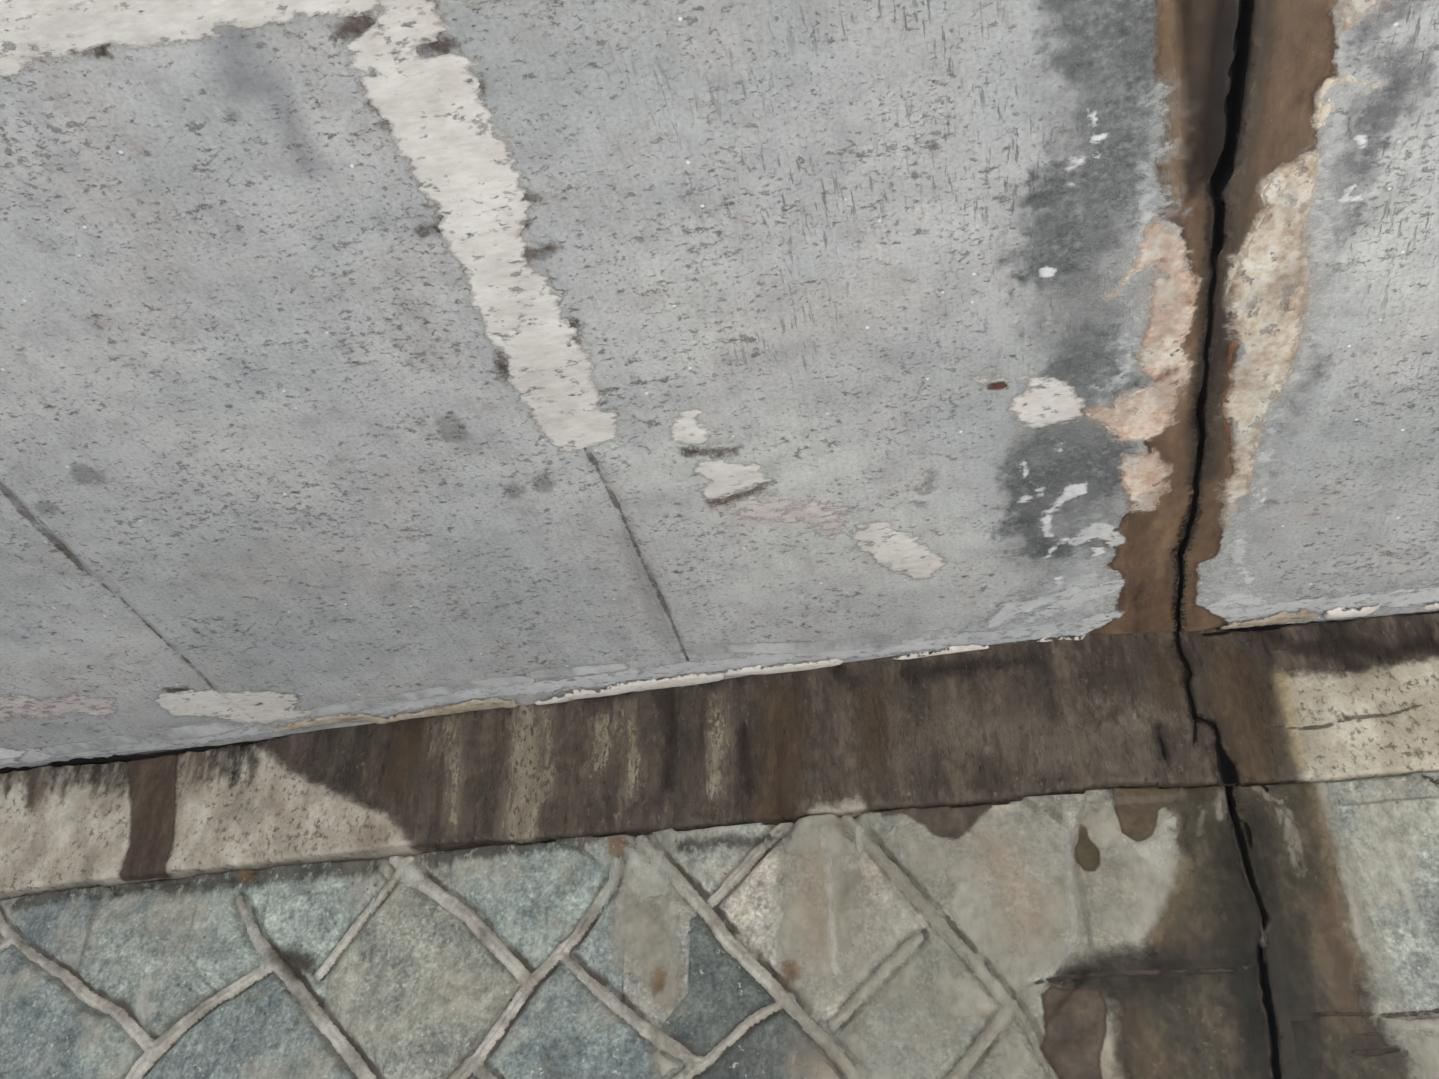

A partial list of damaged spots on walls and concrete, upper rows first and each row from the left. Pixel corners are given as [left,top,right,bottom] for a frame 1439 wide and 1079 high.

peeling [0,0,622,452]
water stain [0,0,1221,767]
peeling [670,409,946,580]
crack [1035,0,1439,1079]
water stain [1179,0,1439,1079]
water stain [119,750,179,881]
water stain [248,632,1272,1079]